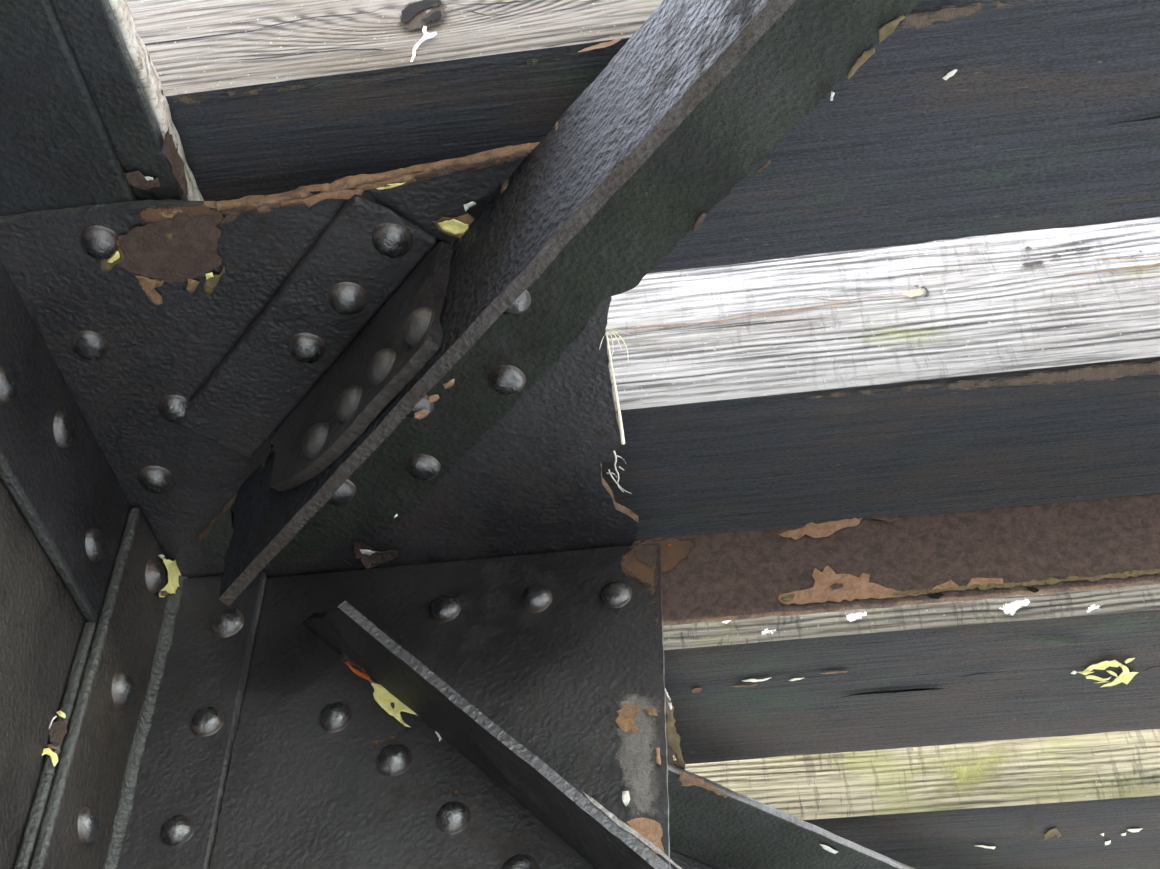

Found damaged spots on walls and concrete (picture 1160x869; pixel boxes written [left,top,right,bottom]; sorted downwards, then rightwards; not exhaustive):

rust [101,143,531,305]
rust [779,513,899,540]
peeling [158,554,181,597]
rust [778,566,1003,605]
peeling [343,654,417,727]